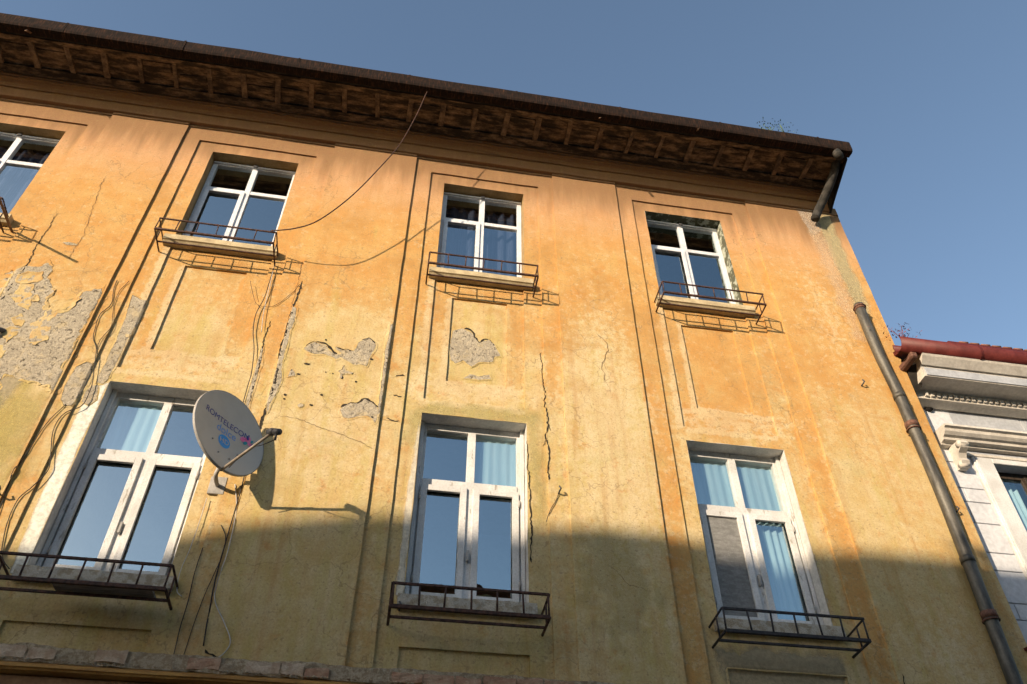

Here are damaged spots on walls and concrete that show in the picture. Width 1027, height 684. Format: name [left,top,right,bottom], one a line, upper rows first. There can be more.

flaking render [0,260,149,408]
spalling [244,305,395,425]
flaking render [447,327,503,381]